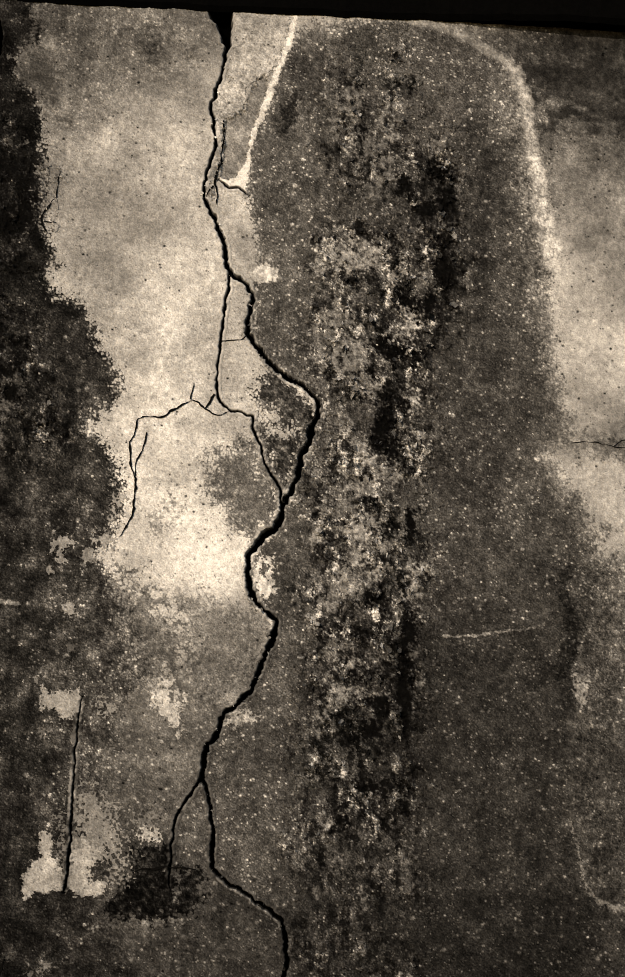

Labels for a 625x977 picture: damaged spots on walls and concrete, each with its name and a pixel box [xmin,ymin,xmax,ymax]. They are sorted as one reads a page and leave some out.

leakage [0,0,72,196]
leakage [99,20,211,71]
leakage [0,207,268,977]
crack [119,11,324,977]
leakage [194,15,625,977]
crack [60,697,86,893]
peeling [19,770,171,904]
peeling [23,956,56,977]